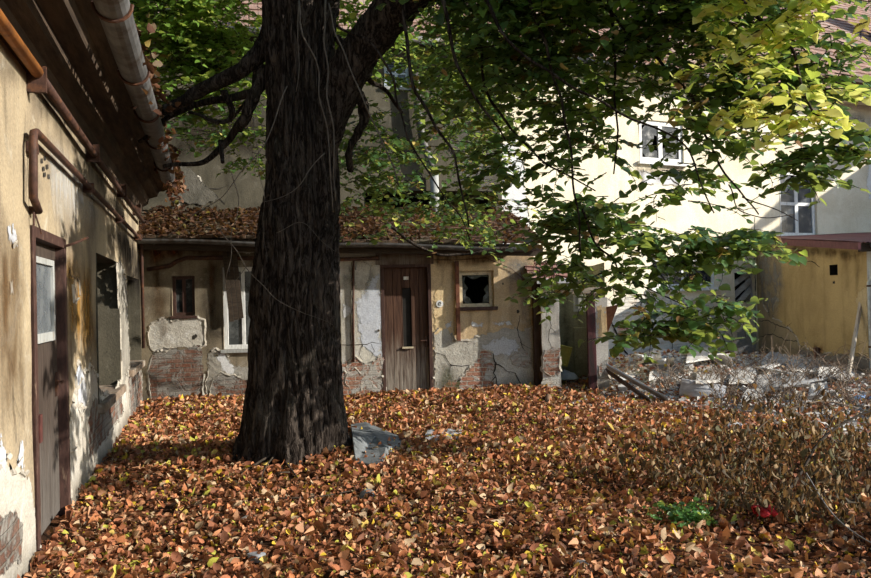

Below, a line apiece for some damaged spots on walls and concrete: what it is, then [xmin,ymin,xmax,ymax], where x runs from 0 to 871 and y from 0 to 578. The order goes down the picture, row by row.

leakage [1,256,17,379]
peeling [342,261,387,397]
flaking render [432,282,563,390]
crack [489,354,527,385]
flaking render [0,435,42,578]